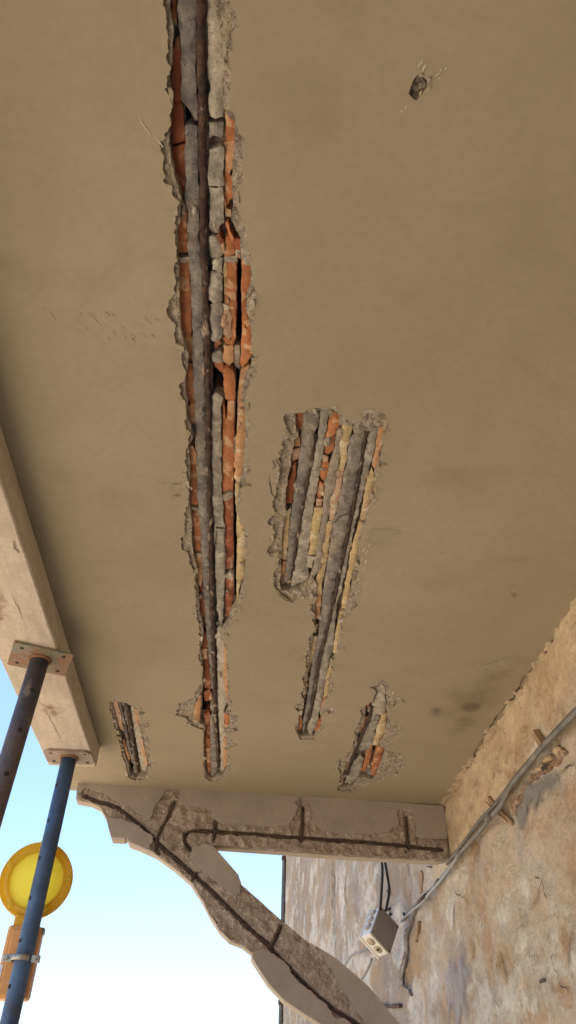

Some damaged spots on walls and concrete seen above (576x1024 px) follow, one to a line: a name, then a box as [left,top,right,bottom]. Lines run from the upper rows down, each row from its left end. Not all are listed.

spalling [409,75,431,99]
spalling [237,248,257,326]
spalling [188,0,231,779]
spalling [234,493,247,594]
spalling [291,432,318,574]
spalling [298,431,369,720]
spalling [115,702,150,781]
spalling [339,705,374,785]
spalling [511,745,569,816]
spalling [76,788,449,1024]